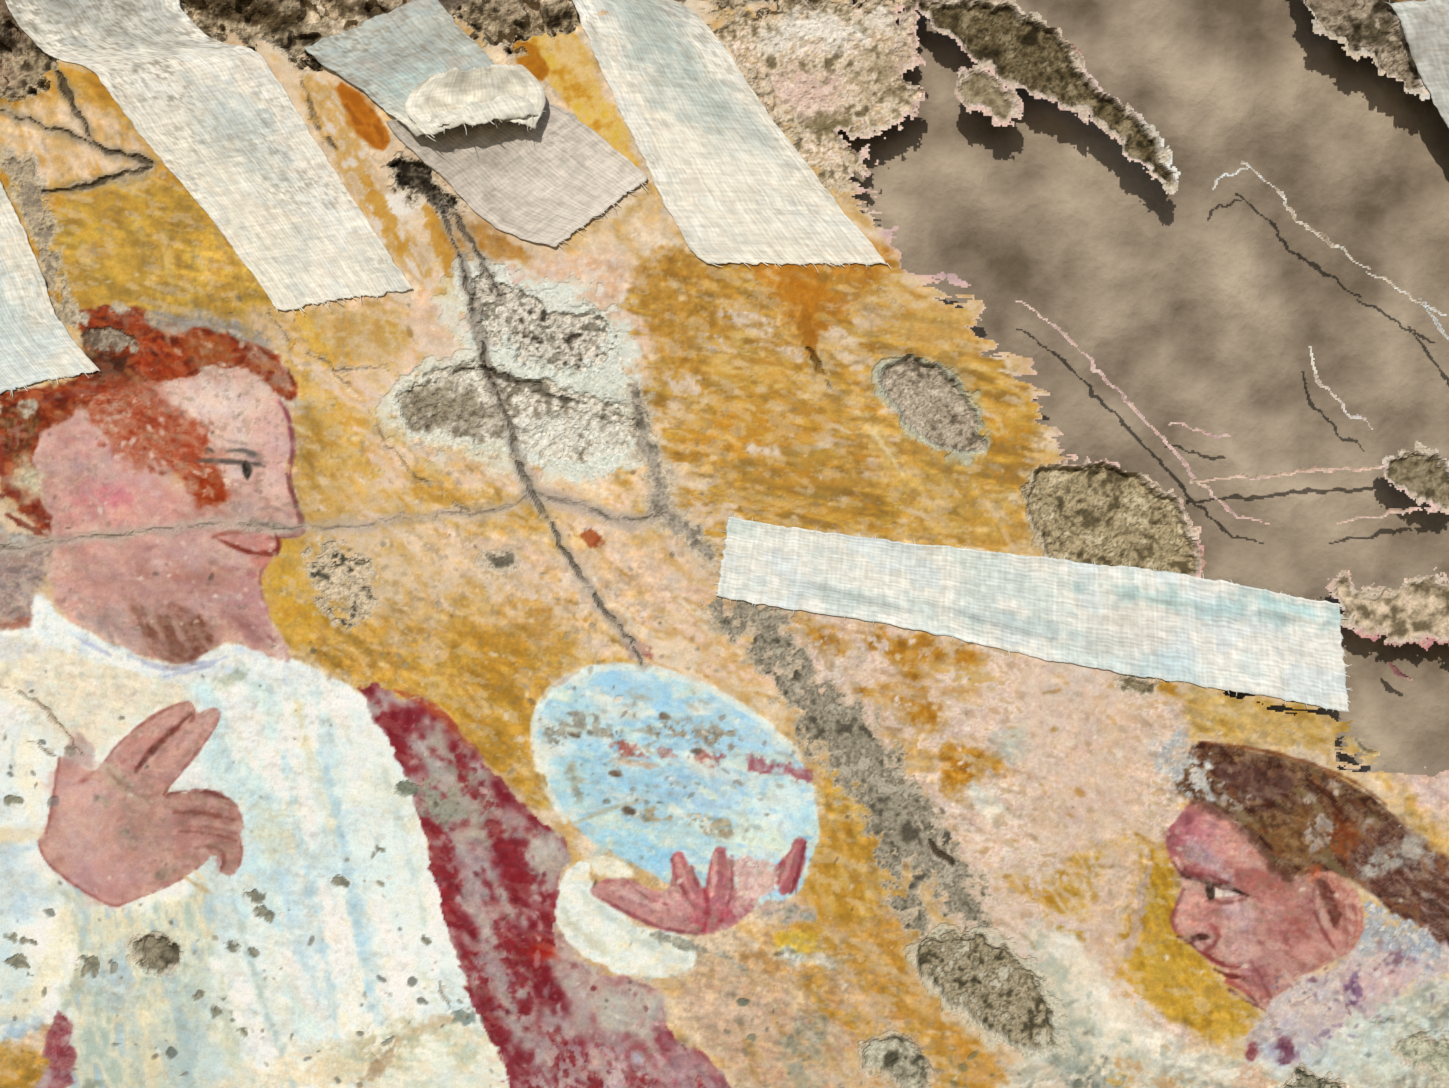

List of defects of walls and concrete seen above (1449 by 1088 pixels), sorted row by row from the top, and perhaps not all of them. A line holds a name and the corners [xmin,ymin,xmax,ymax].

crack [0,72,156,195]
spalling [179,0,412,78]
spalling [674,0,1181,202]
spalling [1304,0,1430,101]
crack [1212,161,1449,340]
crack [0,199,669,668]
spalling [387,260,723,570]
spalling [1018,454,1207,578]
crack [1016,301,1389,524]
crack [1337,507,1426,524]
spalling [1325,567,1449,651]
spalling [698,592,1072,1066]